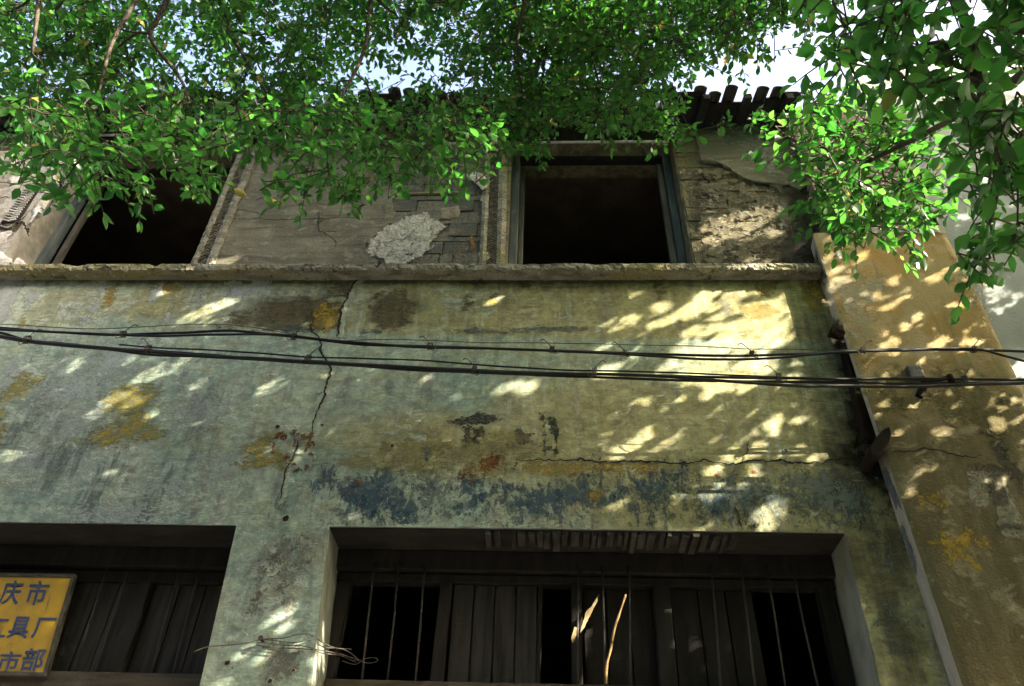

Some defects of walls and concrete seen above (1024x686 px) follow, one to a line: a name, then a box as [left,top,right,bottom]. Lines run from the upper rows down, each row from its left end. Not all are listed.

spalling [364,169,490,265]
spalling [695,109,932,264]
peeling [0,337,260,524]
crack [277,261,381,506]
peeling [310,444,917,591]
crack [521,443,863,465]
crack [893,447,980,458]